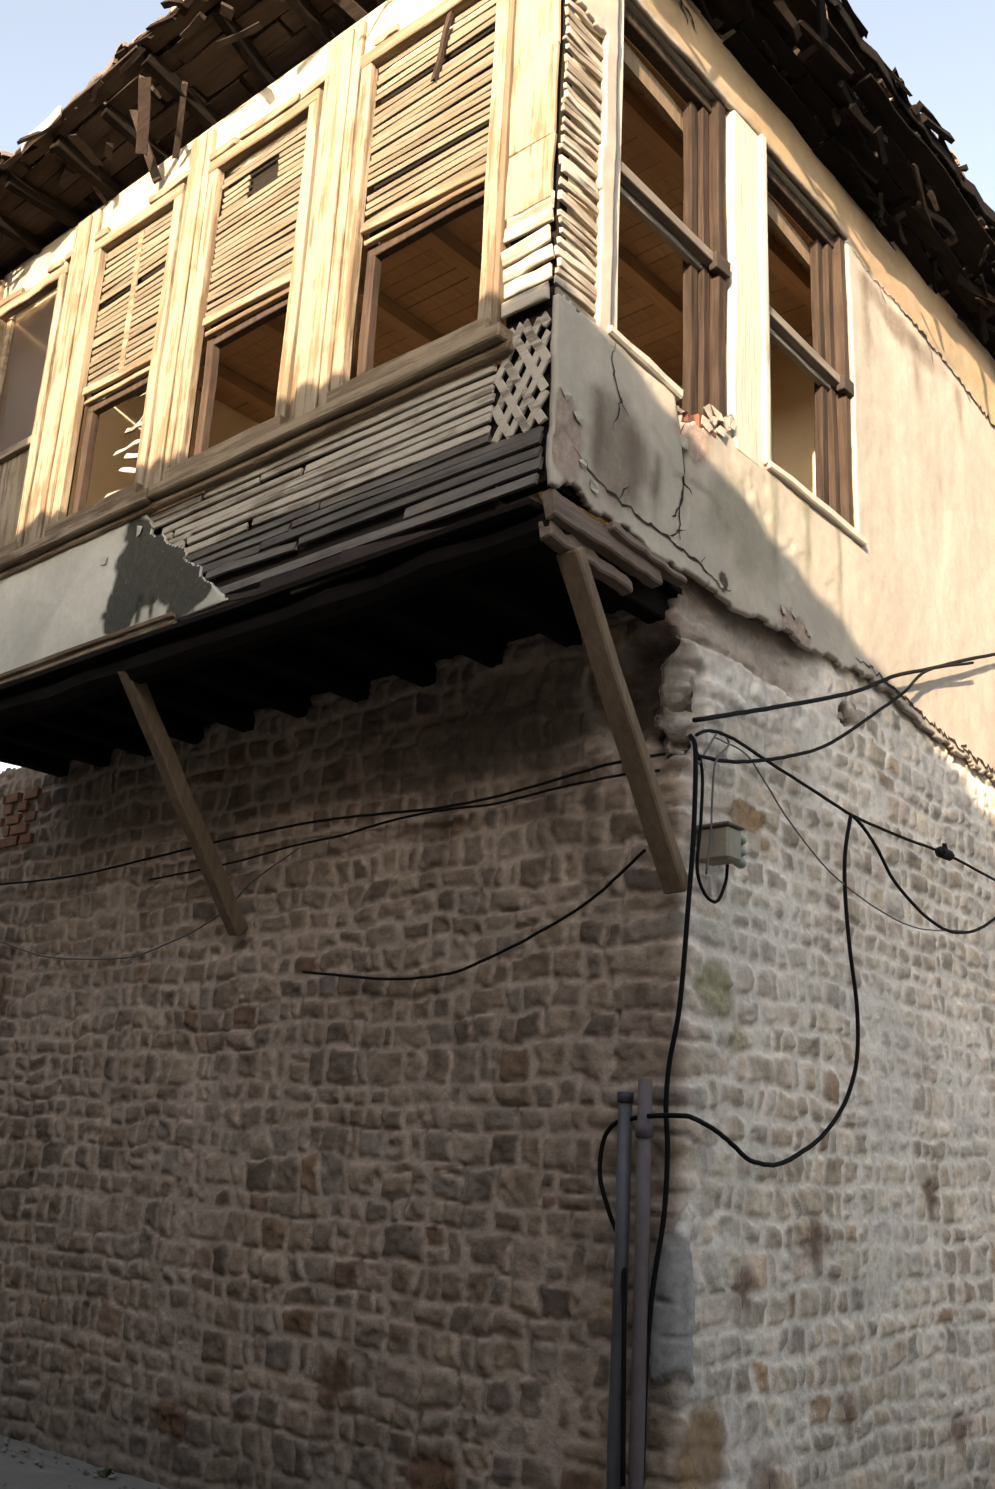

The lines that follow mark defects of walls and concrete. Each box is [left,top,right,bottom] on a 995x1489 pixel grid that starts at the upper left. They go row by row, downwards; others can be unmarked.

flaking render [552,386,599,494]
crack [611,344,629,429]
peeling [701,404,736,437]
crack [573,424,731,592]
flaking render [100,517,212,637]
flaking render [781,604,812,647]